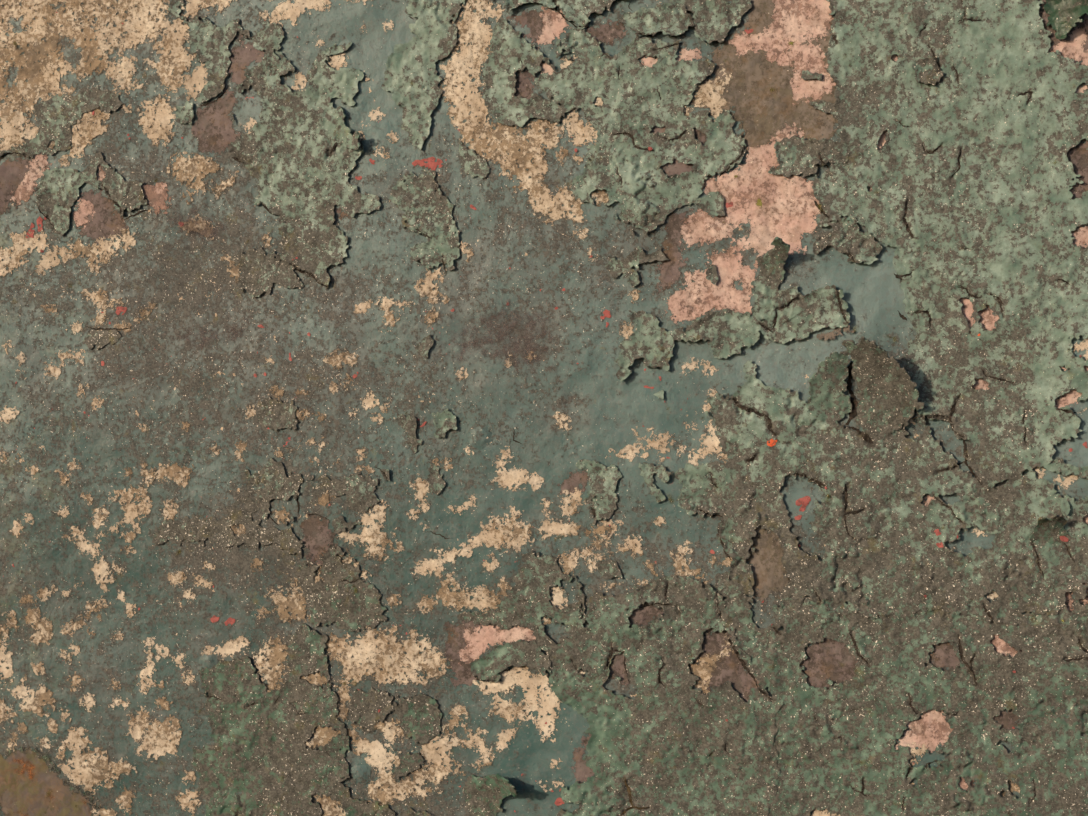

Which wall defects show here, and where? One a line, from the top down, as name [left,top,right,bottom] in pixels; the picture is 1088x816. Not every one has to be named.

peeling [0,0,381,298]
peeling [354,170,473,359]
peeling [348,390,391,425]
peeling [381,0,1088,816]
crack [733,398,777,436]
crack [846,361,873,444]
crack [923,400,982,485]
crack [794,473,865,539]
peeling [0,458,196,816]
peeling [152,457,784,816]
crack [716,592,773,700]
crack [958,635,977,685]